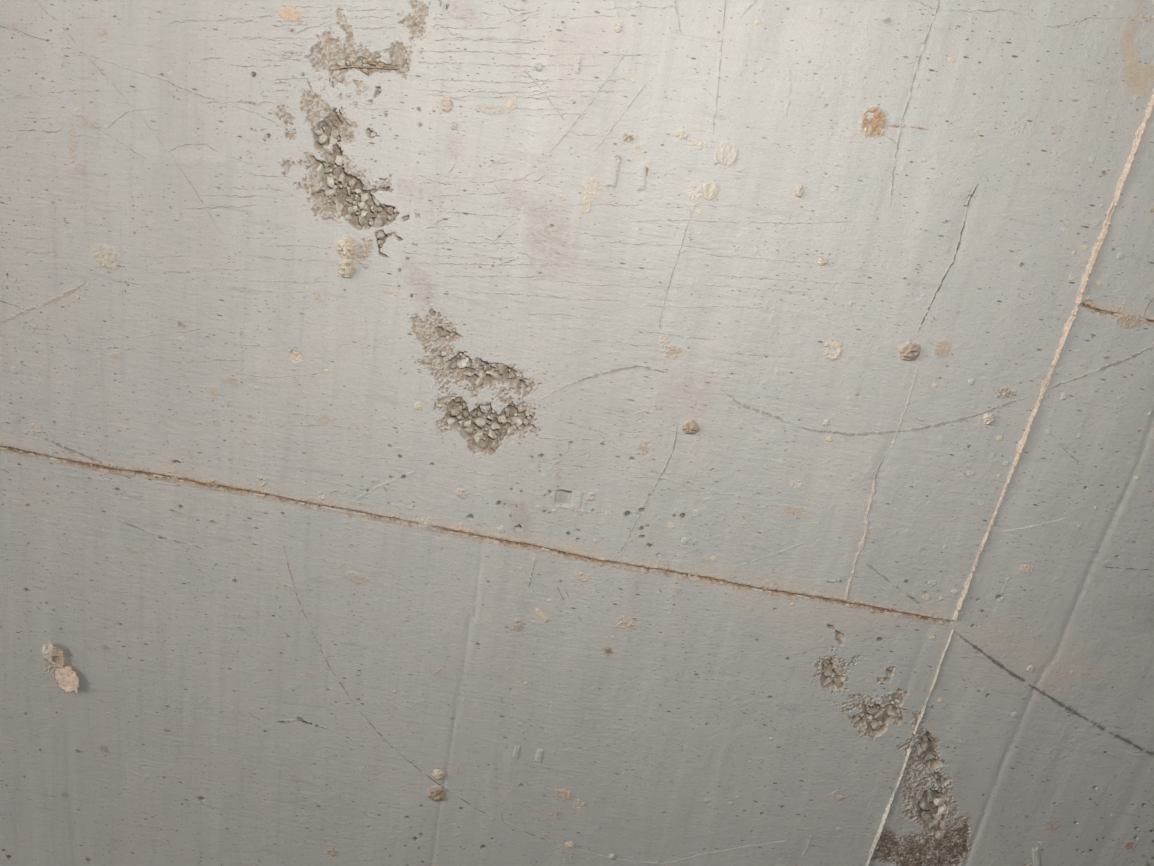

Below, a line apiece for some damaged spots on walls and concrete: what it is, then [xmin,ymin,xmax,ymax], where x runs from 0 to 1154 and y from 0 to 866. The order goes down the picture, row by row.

crack [0,0,395,234]
crack [367,0,681,139]
crack [699,0,726,135]
crack [883,0,1131,204]
crack [0,300,322,378]
crack [110,244,336,293]
crack [363,156,884,357]
crack [916,176,981,338]
crack [618,410,738,558]
crack [274,545,564,847]